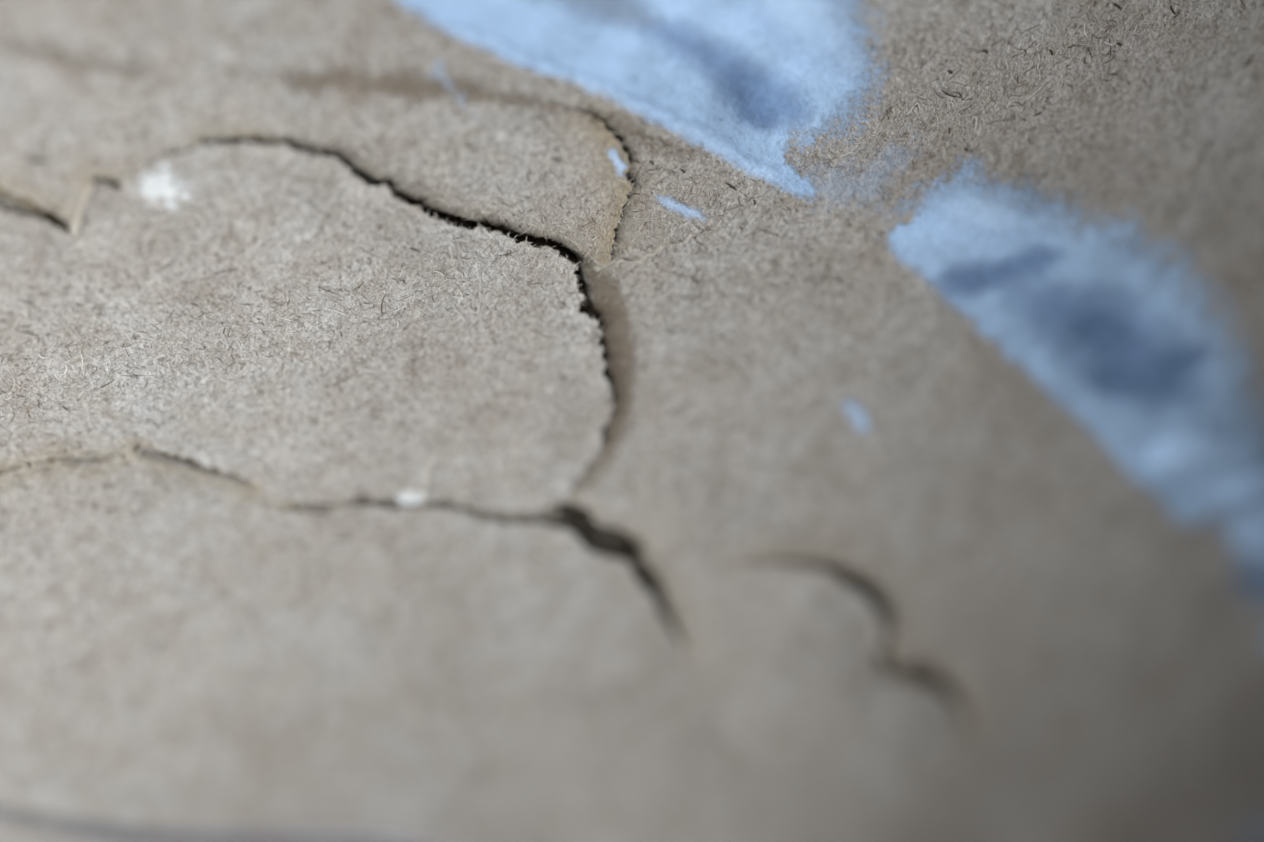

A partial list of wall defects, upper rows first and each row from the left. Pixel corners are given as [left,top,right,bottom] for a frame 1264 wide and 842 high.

crack [96,179,121,190]
crack [0,185,71,233]
crack [206,117,690,650]
crack [0,446,257,489]
crack [754,558,977,731]